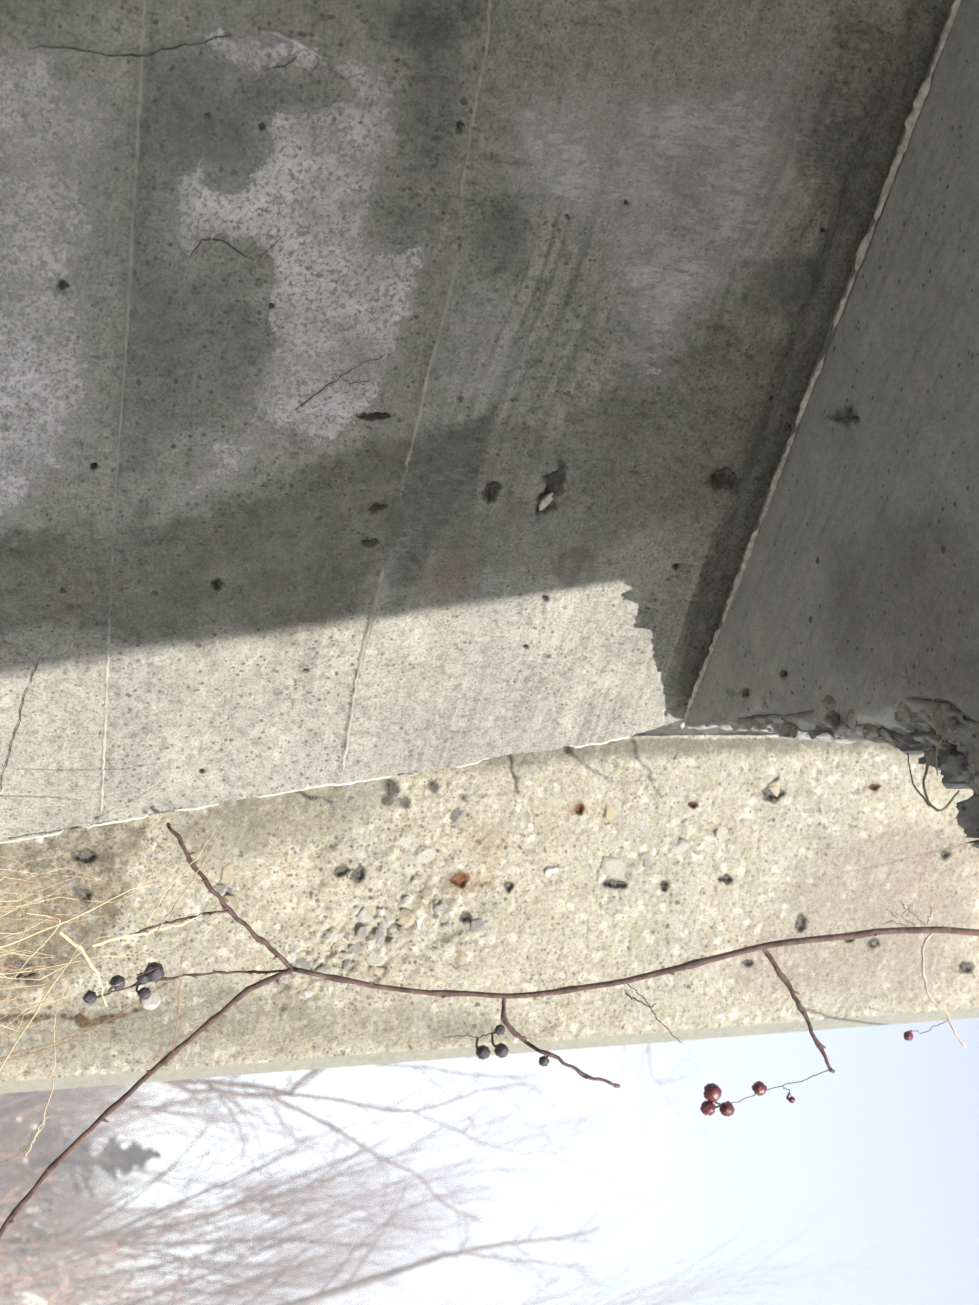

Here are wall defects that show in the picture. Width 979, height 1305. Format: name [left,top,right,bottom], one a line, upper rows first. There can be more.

crack [30,34,237,57]
damp [833,0,961,329]
crack [189,234,286,277]
damp [526,92,769,373]
damp [0,53,95,516]
crack [295,354,390,411]
damp [680,354,825,731]
crack [908,697,978,723]
spalling [822,694,979,795]
spalling [760,777,786,804]
spalling [673,802,700,855]
spalling [643,851,669,892]